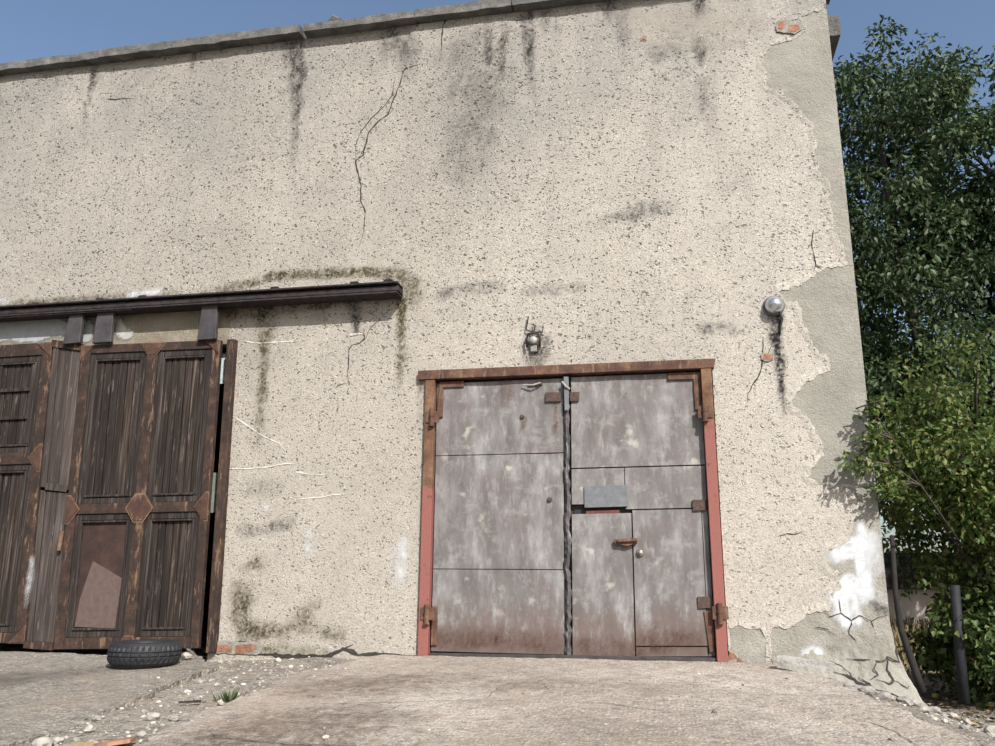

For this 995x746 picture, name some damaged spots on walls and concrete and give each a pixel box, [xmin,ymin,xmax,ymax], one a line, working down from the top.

damp [290,41,305,115]
crack [355,64,418,245]
damp [769,315,785,402]
flaking render [728,6,890,663]
damp [829,531,880,569]
damp [829,573,875,629]
crack [816,601,914,697]